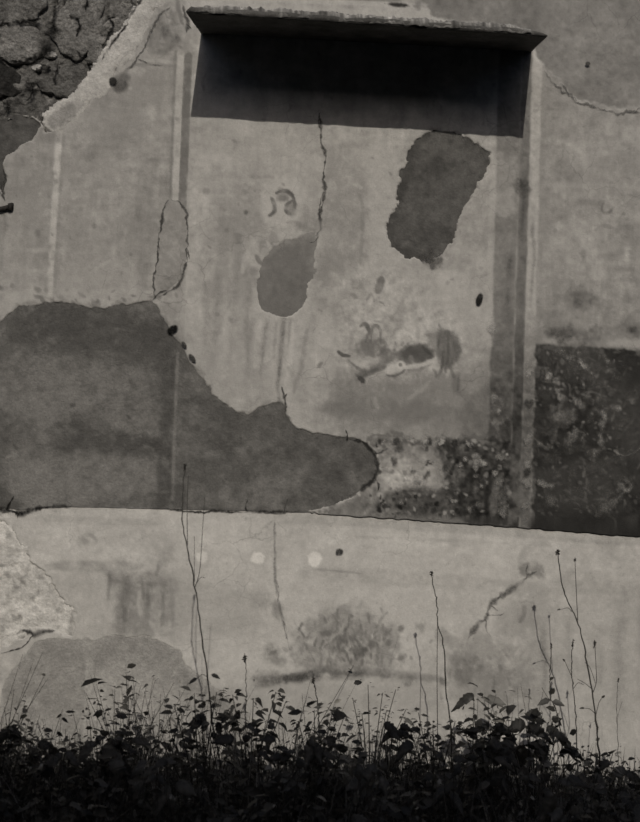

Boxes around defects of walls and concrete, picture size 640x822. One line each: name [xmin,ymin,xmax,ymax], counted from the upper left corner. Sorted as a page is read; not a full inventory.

flaking render [0,0,138,121]
crack [555,84,638,115]
crack [311,113,327,243]
crack [153,200,190,298]
crack [0,496,67,518]
crack [167,500,295,514]